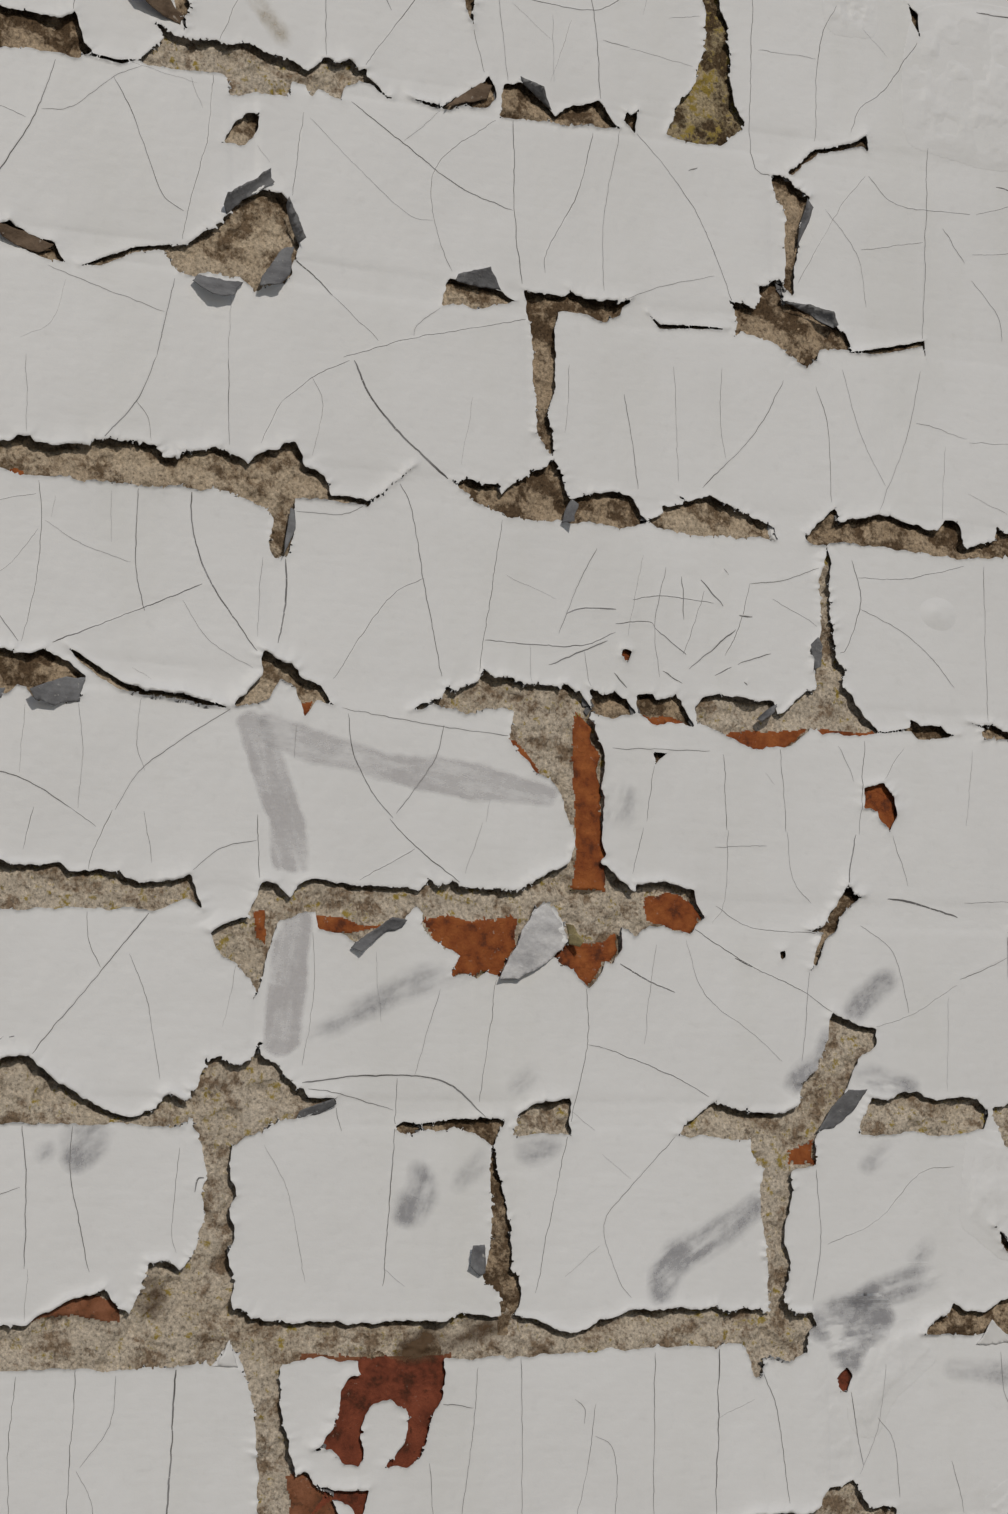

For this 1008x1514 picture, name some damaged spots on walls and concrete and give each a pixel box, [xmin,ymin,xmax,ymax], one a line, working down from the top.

peeling [0,0,391,99]
peeling [653,136,924,368]
crack [0,484,287,668]
peeling [0,435,396,558]
crack [228,261,526,882]
peeling [442,267,771,541]
peeling [211,509,1008,992]
crack [480,520,988,714]
crack [302,940,496,1286]
crack [535,748,832,1298]
peeling [0,1013,1008,1514]
crack [166,1371,176,1514]